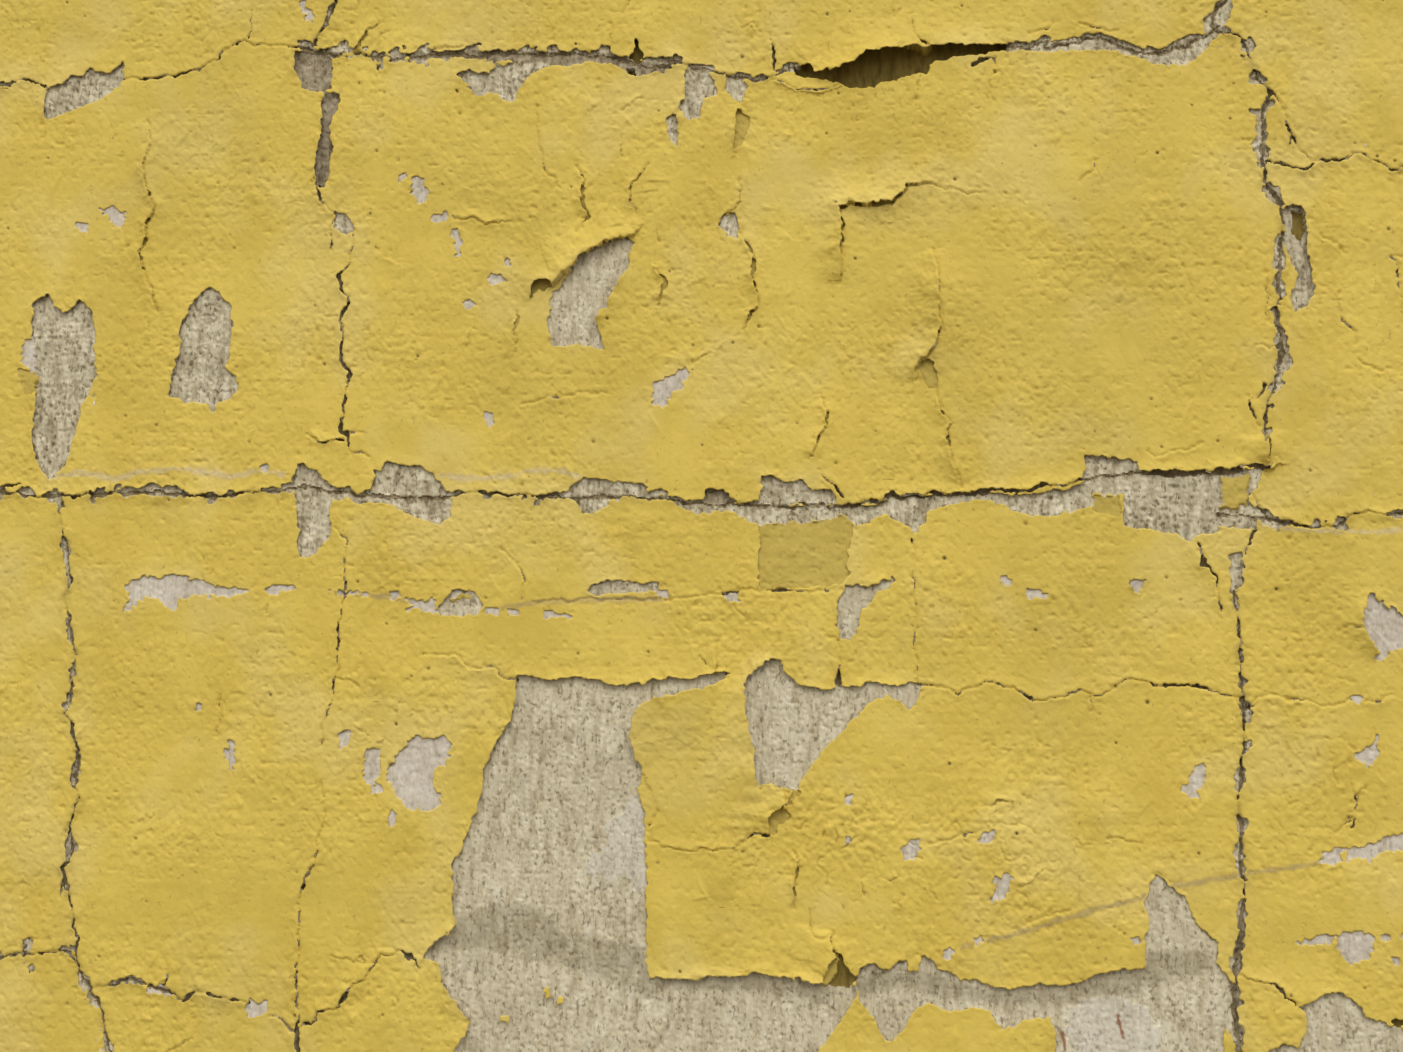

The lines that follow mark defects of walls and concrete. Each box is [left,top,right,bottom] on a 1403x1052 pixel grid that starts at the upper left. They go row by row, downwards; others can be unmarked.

crack [0,79,50,92]
crack [123,0,835,91]
peeling [18,294,97,480]
peeling [169,287,239,413]
crack [309,185,364,454]
peeling [487,207,642,349]
crack [971,0,1403,442]
peeling [291,461,452,558]
peeling [704,455,1264,640]
crack [1216,493,1403,555]
crack [0,463,1296,1052]
peeling [422,655,1244,1052]